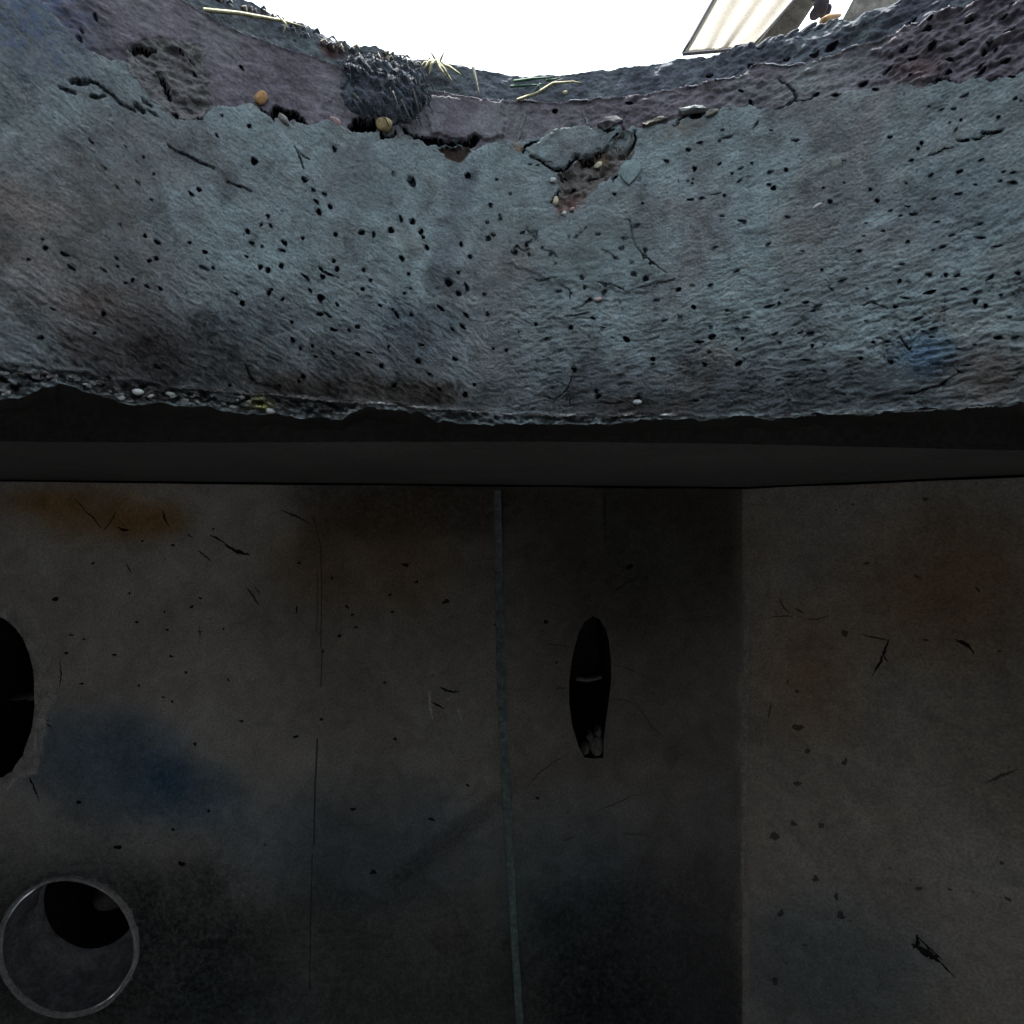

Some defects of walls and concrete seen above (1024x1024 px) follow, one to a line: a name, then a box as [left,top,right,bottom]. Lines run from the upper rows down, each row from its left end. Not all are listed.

crack [59,78,157,116]
spalling [125,35,224,120]
spalling [260,107,305,125]
crack [169,147,250,192]
spalling [553,115,642,214]
crack [511,223,672,317]